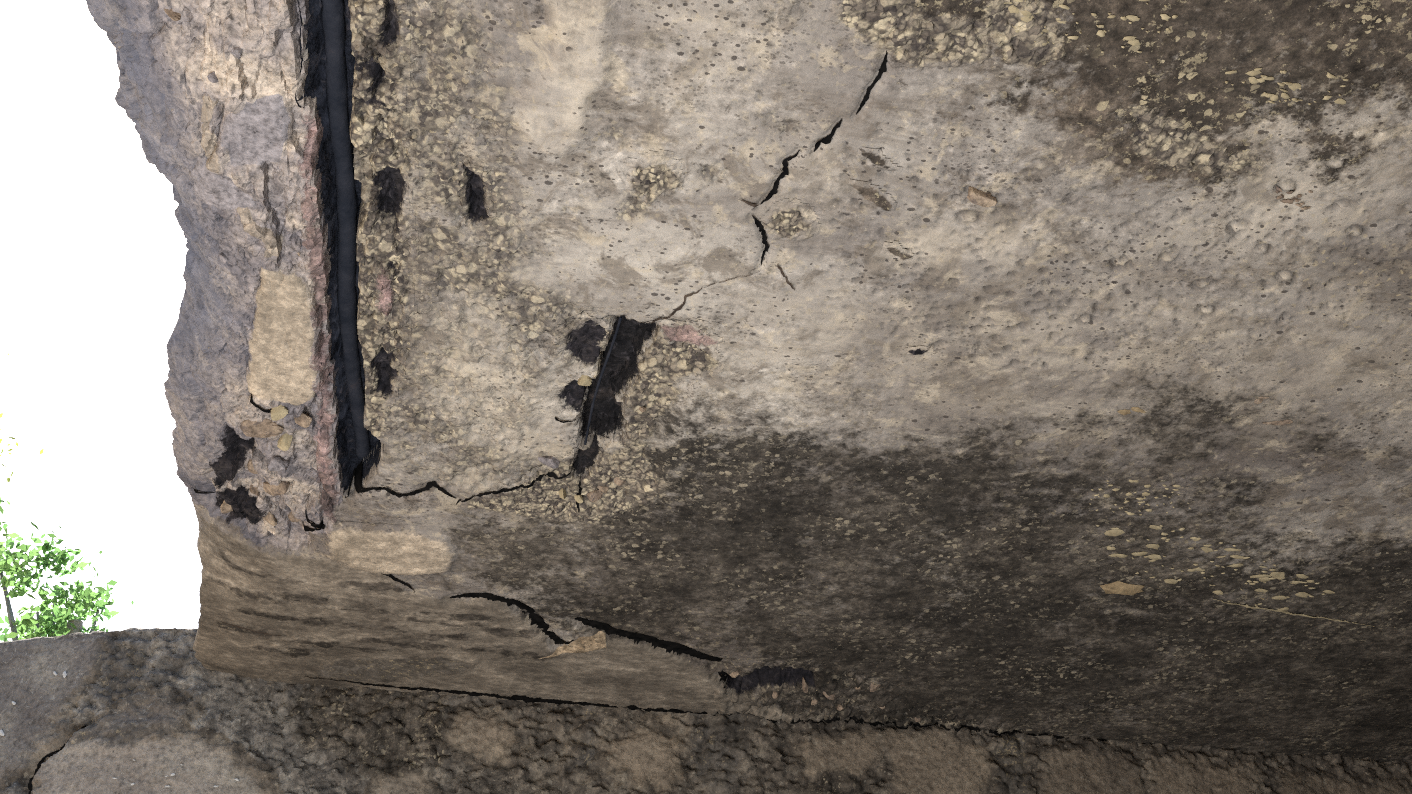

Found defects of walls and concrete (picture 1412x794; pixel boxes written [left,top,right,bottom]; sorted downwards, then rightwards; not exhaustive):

crack [651,51,888,324]
damp [760,0,1412,220]
crack [250,394,273,413]
crack [381,573,415,592]
crack [303,461,582,532]
spalling [458,311,728,525]
crack [304,593,1107,744]
damp [201,335,1412,794]